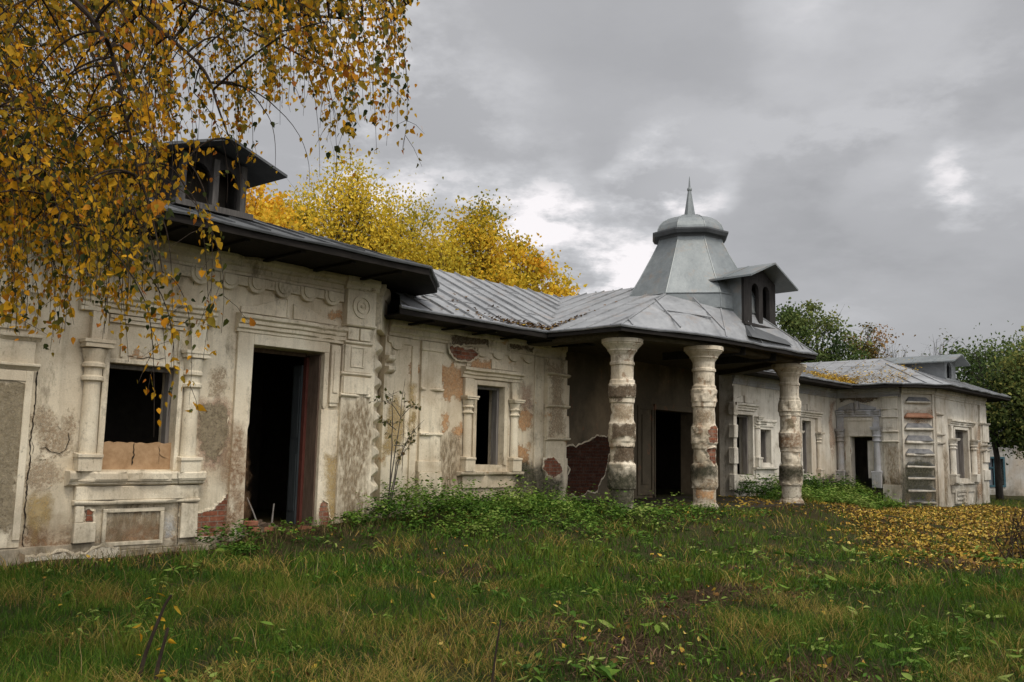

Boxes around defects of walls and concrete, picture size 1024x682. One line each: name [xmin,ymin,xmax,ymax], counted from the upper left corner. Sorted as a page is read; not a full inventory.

crack [22,371,70,547]
flaking render [197,491,228,537]
flaking render [316,498,333,526]
leakage [338,402,372,520]
peeling [442,344,491,440]
peeling [518,387,533,431]
flaking render [542,361,610,498]
leakage [607,423,636,510]
leakage [608,384,636,402]
flaking render [695,406,718,467]
flaking render [781,481,802,501]